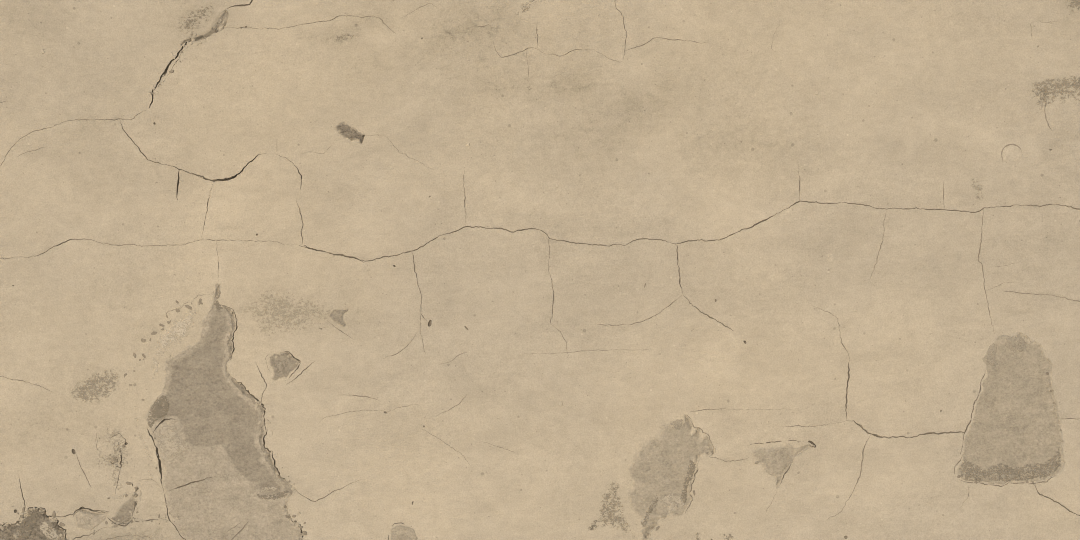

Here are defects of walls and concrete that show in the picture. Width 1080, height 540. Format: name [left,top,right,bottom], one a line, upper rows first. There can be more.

spalling [330,119,365,144]
crack [0,0,1080,401]
spalling [0,481,141,540]
crack [52,418,211,540]
peeling [142,283,307,540]
spalling [388,522,418,540]
spalling [620,414,716,540]
spalling [747,440,816,489]
crack [691,307,965,520]
spalling [954,332,1066,487]
crack [1035,486,1080,516]